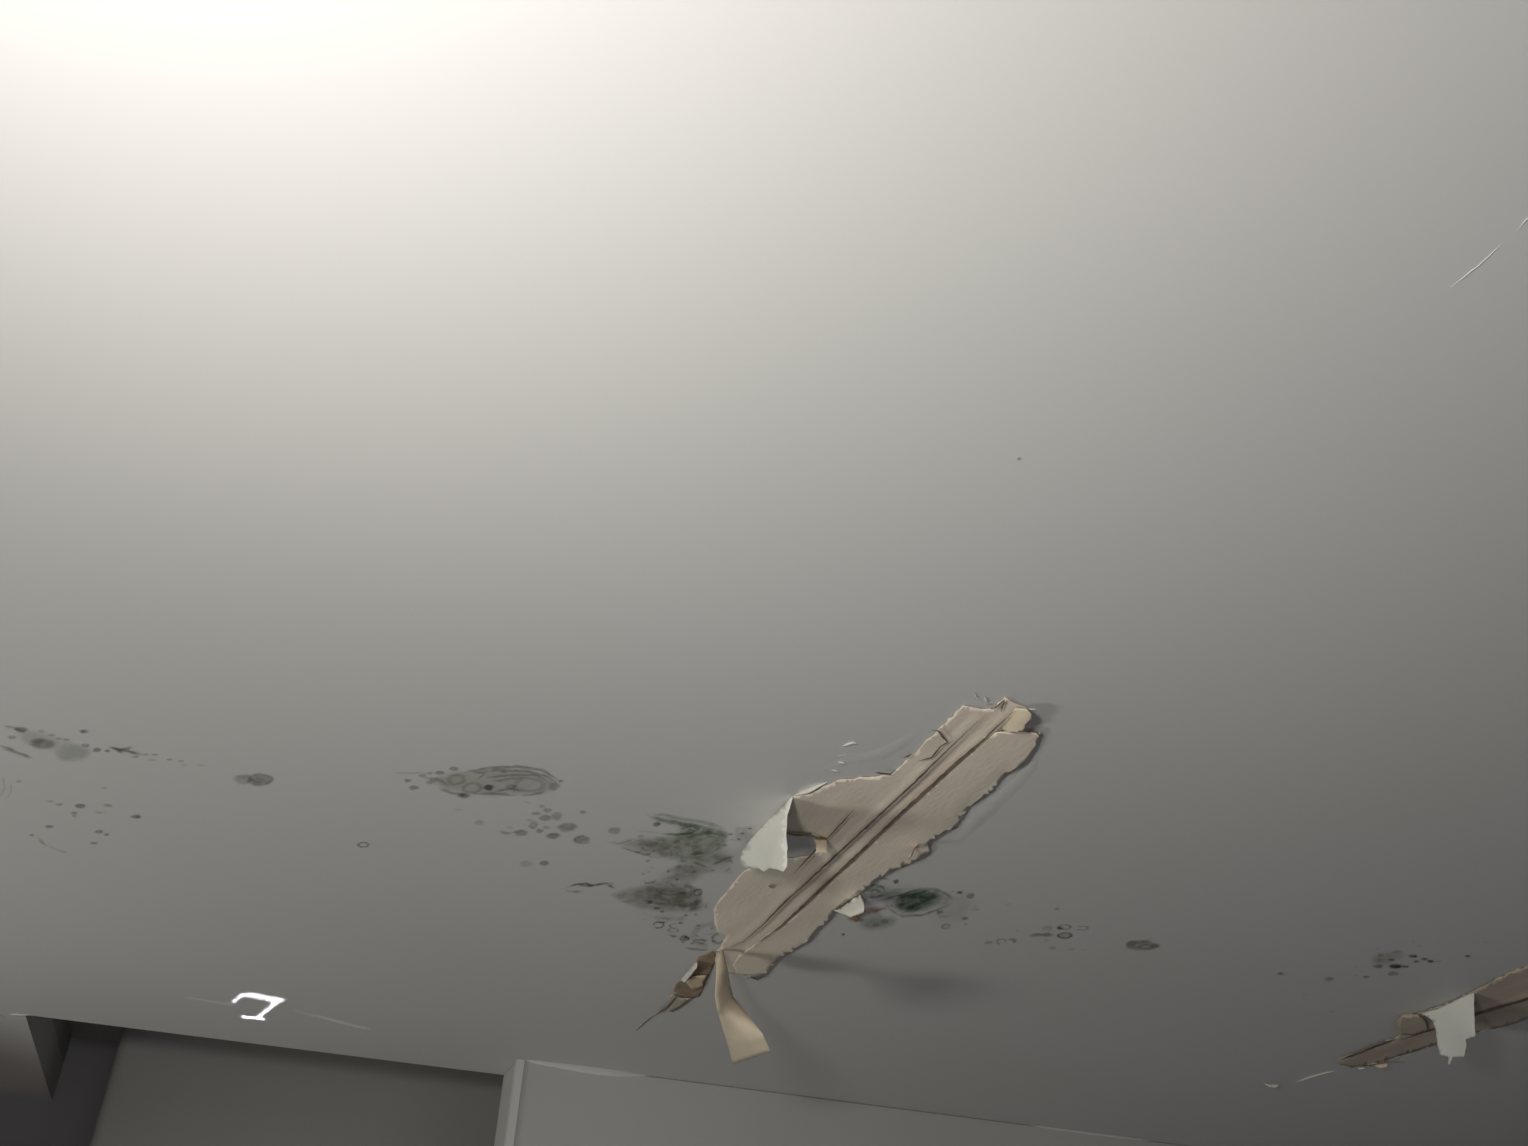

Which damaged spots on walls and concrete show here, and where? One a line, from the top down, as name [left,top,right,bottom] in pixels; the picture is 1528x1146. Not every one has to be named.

spalling [674,951,716,999]